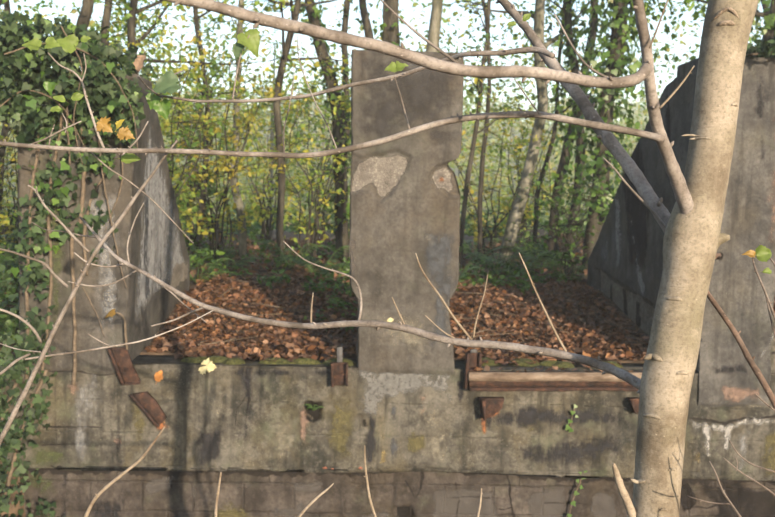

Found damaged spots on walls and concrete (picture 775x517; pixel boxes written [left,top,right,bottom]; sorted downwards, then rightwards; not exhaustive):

spalling [351,155,409,197]
spalling [432,167,453,192]
damp [197,432,221,465]
damp [524,436,618,464]
damp [694,418,769,457]